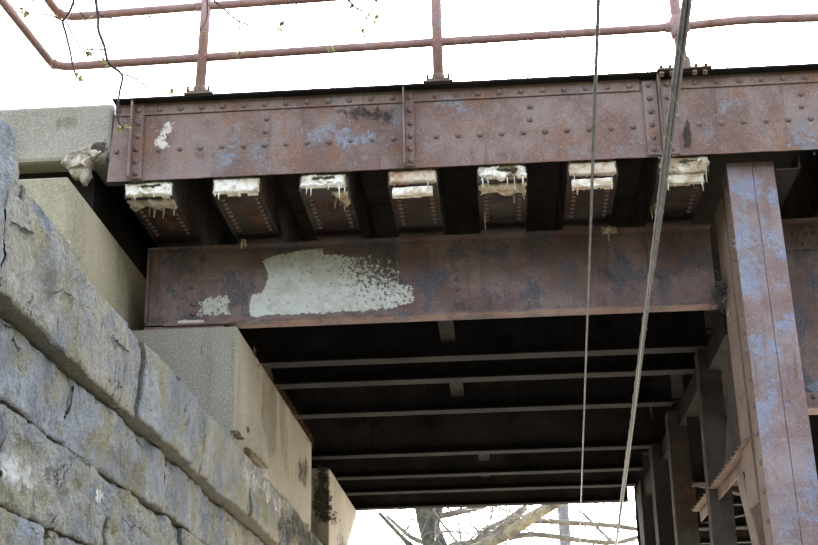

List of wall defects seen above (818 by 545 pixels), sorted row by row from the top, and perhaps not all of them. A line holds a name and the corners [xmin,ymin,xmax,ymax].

rust [337,106,392,131]
rust [683,120,692,148]
spalling [61,140,109,186]
damp [300,174,351,211]
damp [388,170,437,199]
damp [478,164,527,203]
peeling [249,249,415,318]
peeling [177,295,231,323]
damp [242,458,320,545]
damp [312,463,354,545]